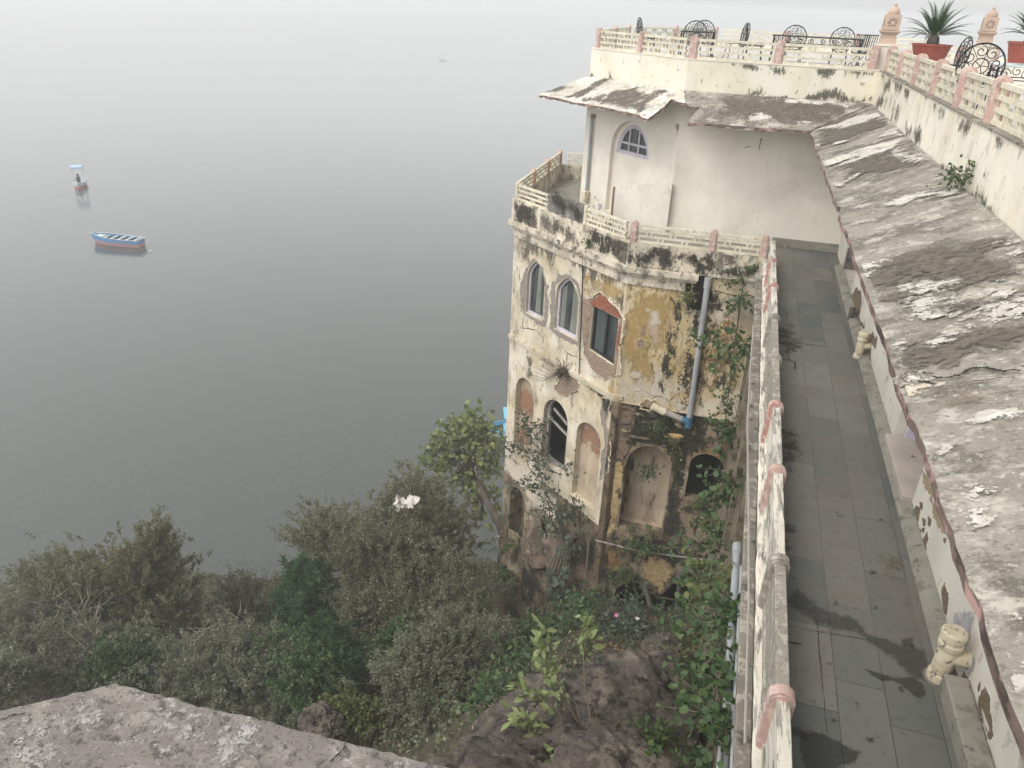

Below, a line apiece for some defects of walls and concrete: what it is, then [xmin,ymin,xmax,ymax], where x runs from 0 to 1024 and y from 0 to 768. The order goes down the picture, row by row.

water stain [546,71,667,113]
water stain [731,63,786,76]
water stain [717,69,994,212]
water stain [513,191,763,280]
water stain [862,236,1024,370]
water stain [518,239,732,598]
spalling [582,291,688,574]
crack [886,366,1021,418]
peeling [914,502,931,552]
water stain [867,670,925,697]
peeling [941,580,995,744]